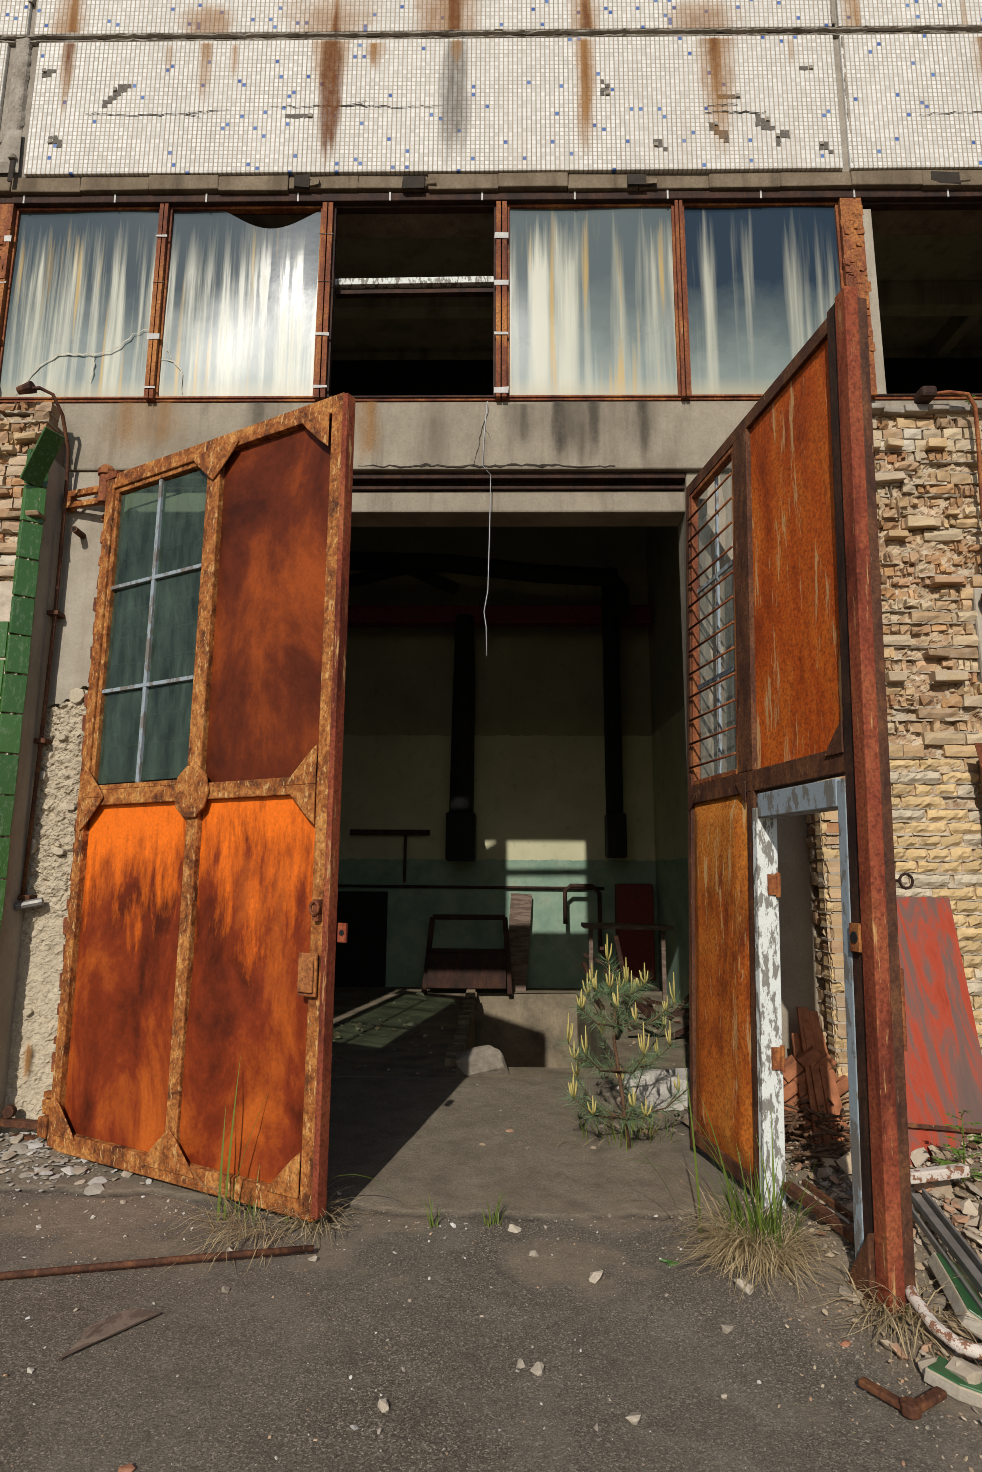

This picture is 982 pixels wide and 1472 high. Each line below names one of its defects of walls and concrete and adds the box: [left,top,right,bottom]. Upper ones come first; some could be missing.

rust [64,0,77,83]
rust [320,2,342,153]
rust [428,0,462,123]
rust [580,0,592,118]
rust [692,14,727,89]
spalling [0,129,22,182]
spalling [708,121,729,142]
spalling [755,114,790,146]